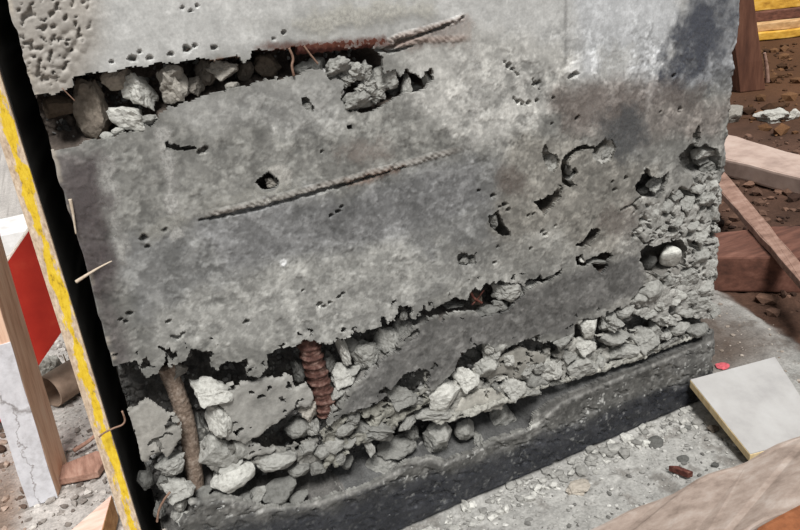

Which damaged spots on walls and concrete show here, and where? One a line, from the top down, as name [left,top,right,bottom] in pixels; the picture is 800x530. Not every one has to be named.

rust [268,38,387,49]
water stain [658,0,726,86]
spalling [8,0,432,151]
hole [611,167,667,198]
spalling [679,126,719,189]
hole [631,226,688,281]
hole [117,309,136,324]
hole [316,291,347,309]
peeling [433,322,694,425]
peeling [127,331,433,493]